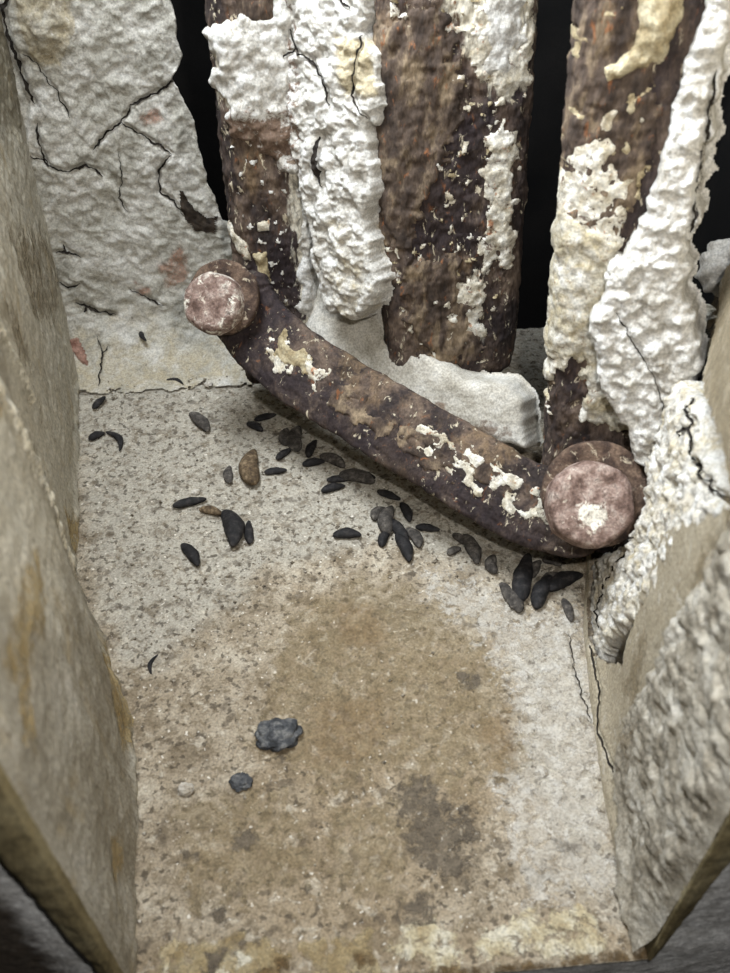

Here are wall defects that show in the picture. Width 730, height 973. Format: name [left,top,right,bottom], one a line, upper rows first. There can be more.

crack [56,244,81,258]
crack [58,281,116,315]
crack [0,0,183,215]
crack [130,289,164,306]
spalling [171,0,252,261]
peeling [257,219,270,232]
spalling [517,0,573,329]
spalling [692,74,730,341]
crack [97,336,108,385]
water stain [421,572,618,905]
water stain [389,775,481,889]
water stain [396,892,436,927]